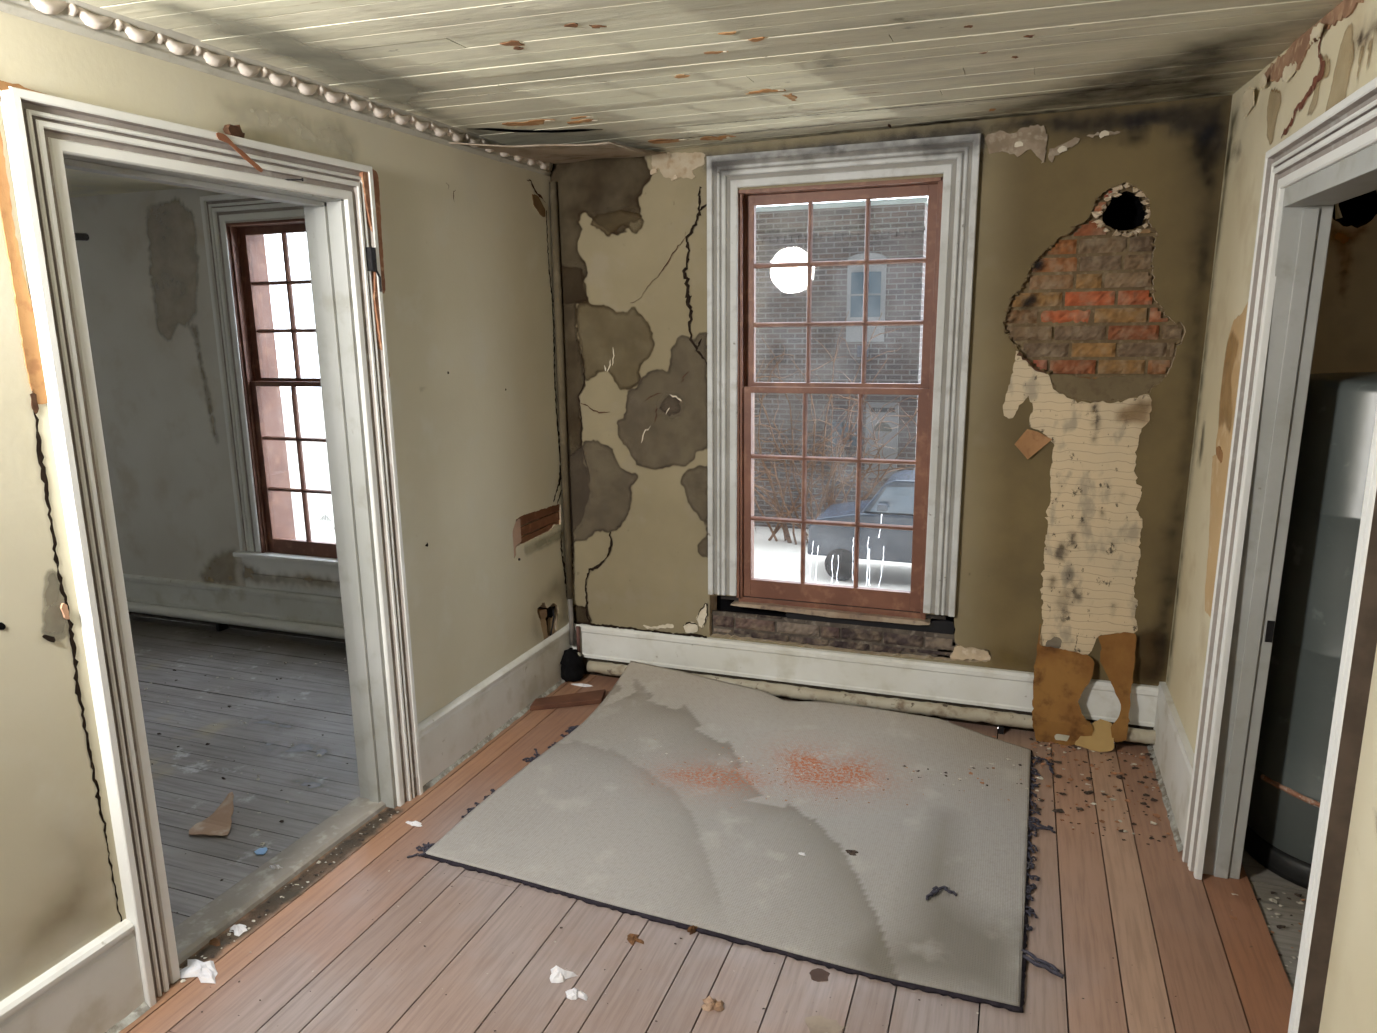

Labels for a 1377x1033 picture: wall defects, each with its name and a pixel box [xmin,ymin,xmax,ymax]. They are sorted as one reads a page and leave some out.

peeling [500,40,524,50]
peeling [1309,22,1325,45]
peeling [748,89,797,101]
peeling [1242,61,1297,119]
leakage [710,160,732,173]
leakage [879,118,985,152]
flaking render [985,124,1120,163]
leakage [1011,37,1260,239]
leakage [147,200,197,339]
flaking render [1002,183,1184,403]
crack [546,187,707,638]
spalling [513,504,560,561]